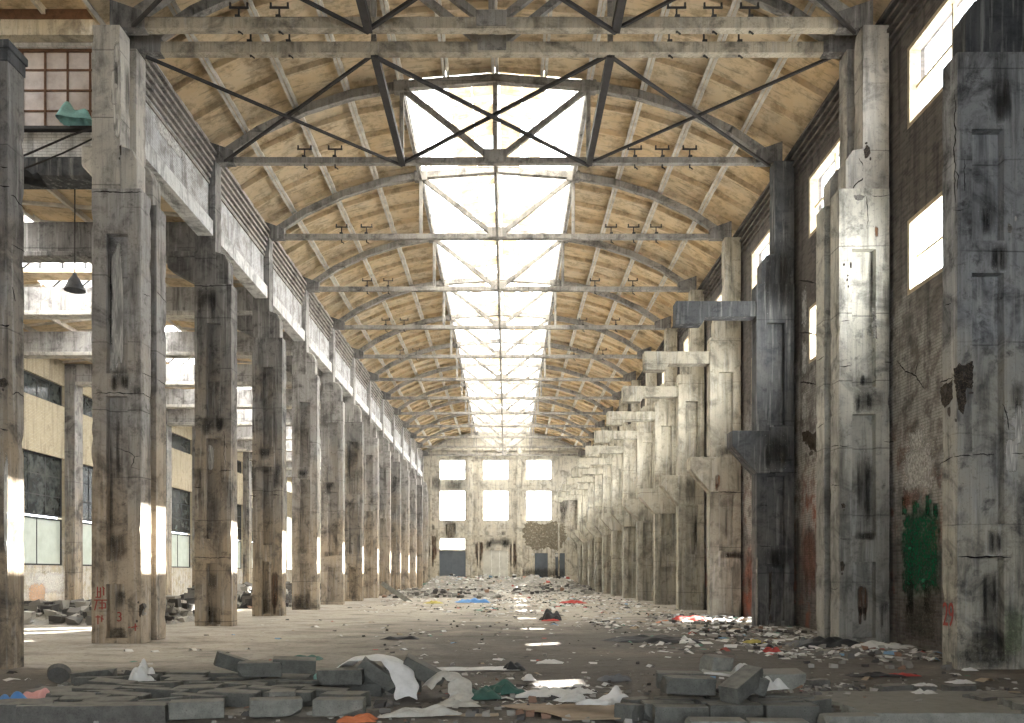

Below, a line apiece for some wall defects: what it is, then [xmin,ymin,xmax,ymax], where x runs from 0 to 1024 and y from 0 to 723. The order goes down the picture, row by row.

crack [887,361,952,388]
spalling [940,361,974,422]
spalling [802,394,817,456]
crack [940,405,1023,464]
crack [960,552,1010,560]